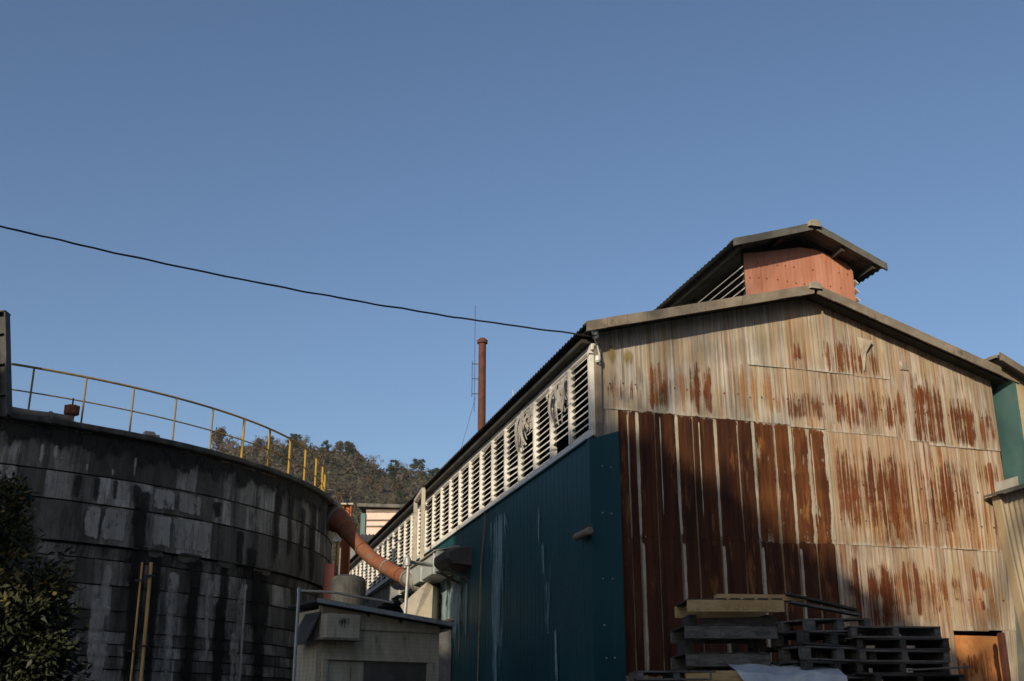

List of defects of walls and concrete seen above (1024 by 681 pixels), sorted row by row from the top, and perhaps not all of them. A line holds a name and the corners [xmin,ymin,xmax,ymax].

rust [822,341,879,375]
damp [0,421,326,681]
rust [608,363,1002,681]